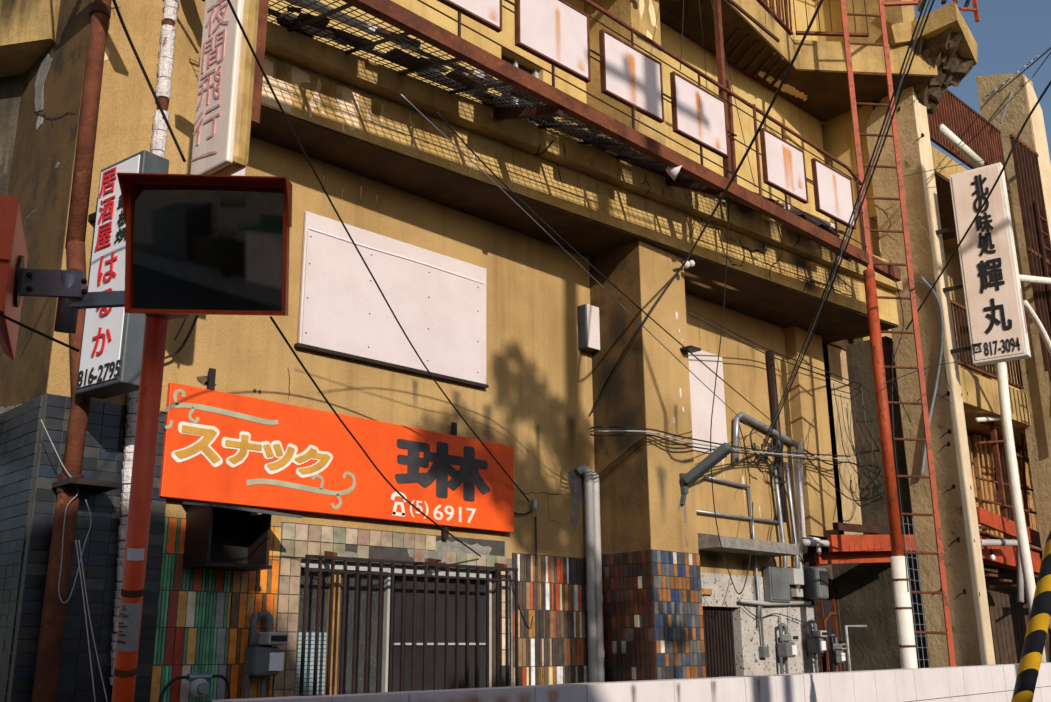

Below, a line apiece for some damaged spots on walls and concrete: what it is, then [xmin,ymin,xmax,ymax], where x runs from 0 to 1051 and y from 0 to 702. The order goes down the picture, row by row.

peeling [261,59,384,132]